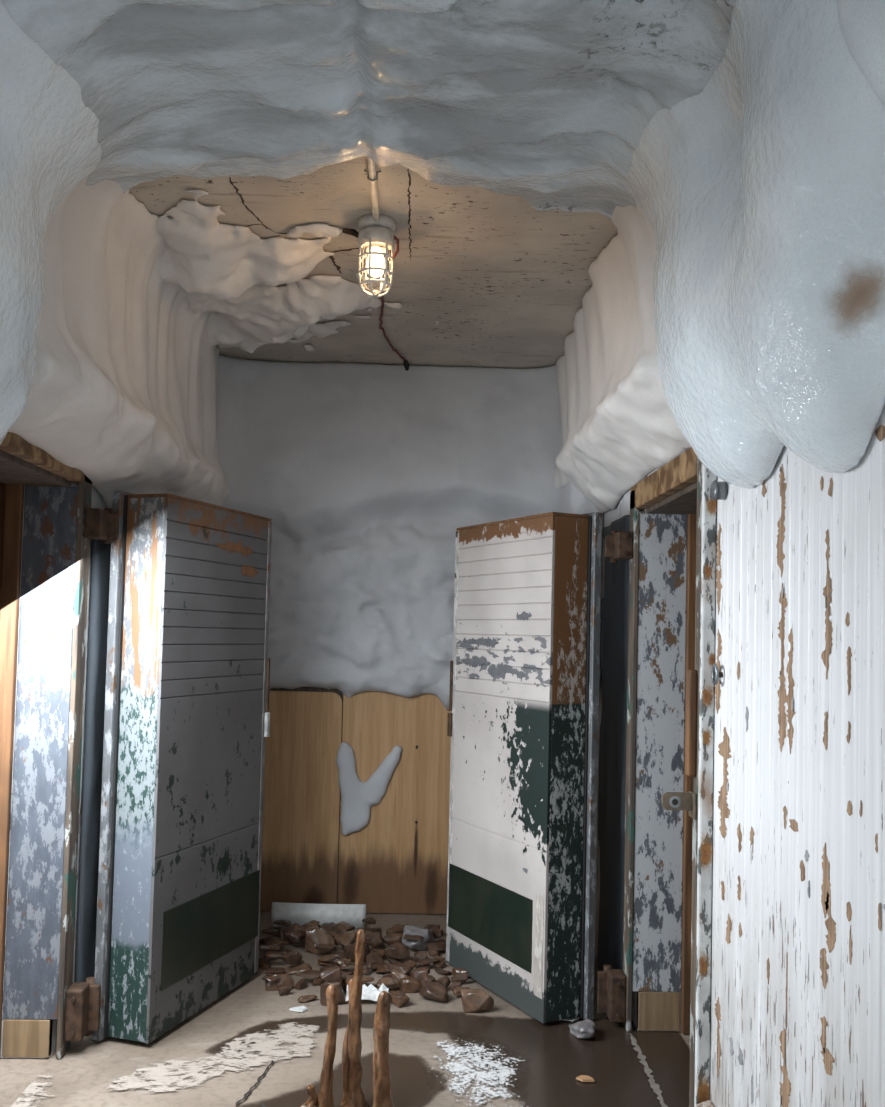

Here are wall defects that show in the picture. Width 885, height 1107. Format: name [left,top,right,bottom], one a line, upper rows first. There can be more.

crack [229,177,287,234]
crack [405,169,413,260]
crack [324,248,359,274]
peeling [776,464,796,754]
peeling [821,529,833,679]
peeling [717,727,754,852]
peeling [799,843,852,989]
crack [236,1060,274,1107]
water stain [207,1014,349,1058]
water stain [238,1062,343,1107]
water stain [361,1012,375,1028]
water stain [389,1011,690,1107]